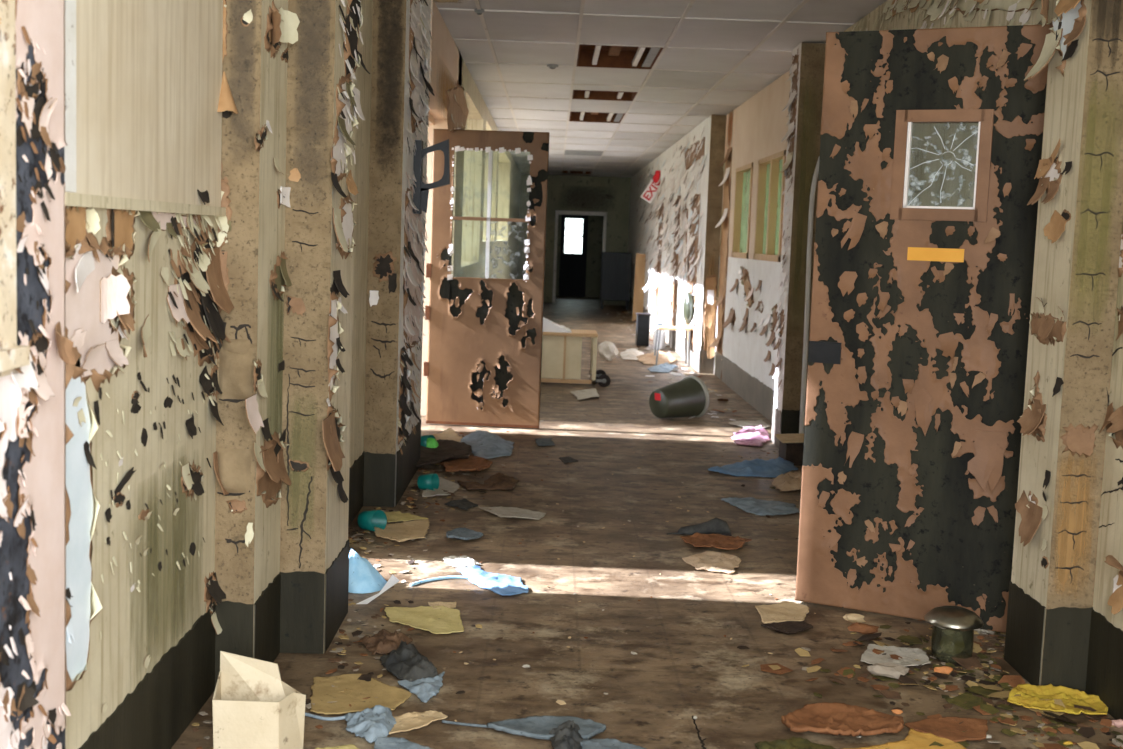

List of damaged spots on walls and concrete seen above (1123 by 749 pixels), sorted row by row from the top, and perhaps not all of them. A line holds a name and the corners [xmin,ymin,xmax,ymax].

peeling [0,0,310,749]
crack [286,337,316,568]
peeling [325,456,530,707]
peeling [369,0,551,454]
peeling [611,50,799,430]
peeling [795,0,1123,749]